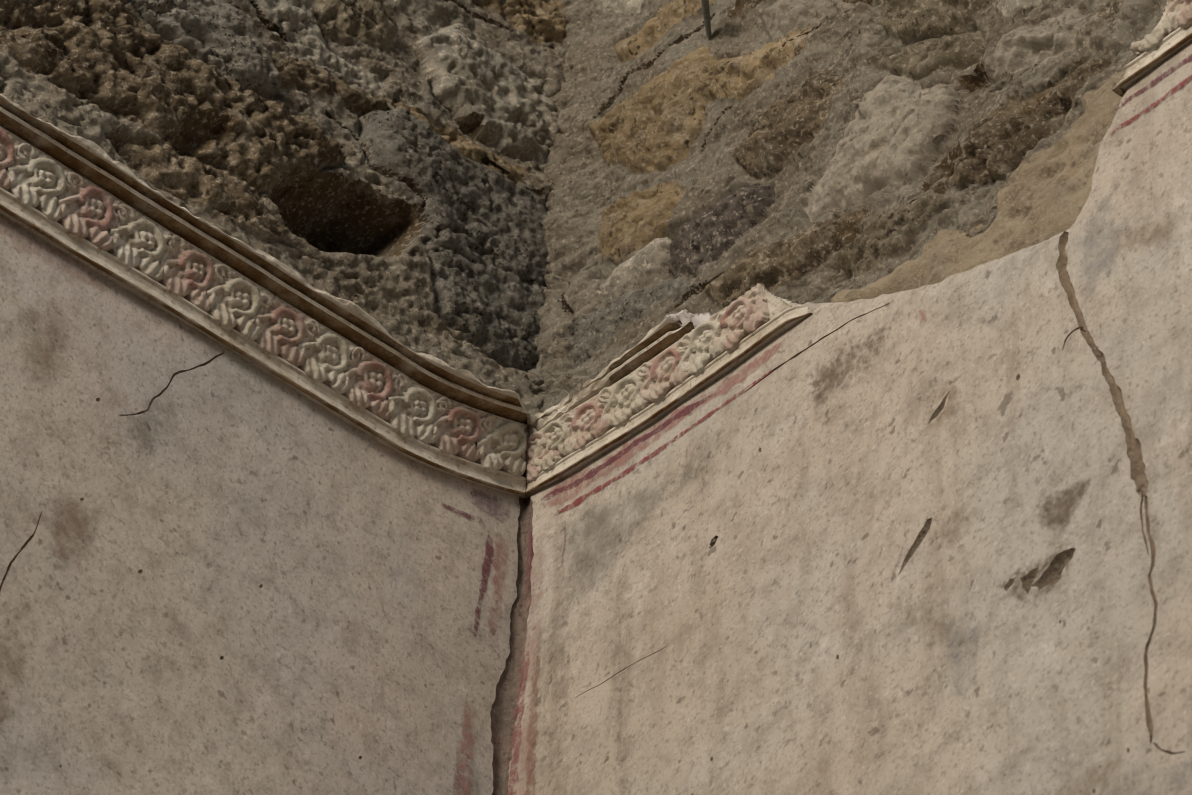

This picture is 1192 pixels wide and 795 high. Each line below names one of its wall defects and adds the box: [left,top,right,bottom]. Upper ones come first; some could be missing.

flaking render [0,0,1167,416]
crack [119,352,224,416]
crack [1056,231,1186,755]
crack [0,511,42,594]
flaking render [898,517,933,575]
flaking render [1004,548,1076,594]